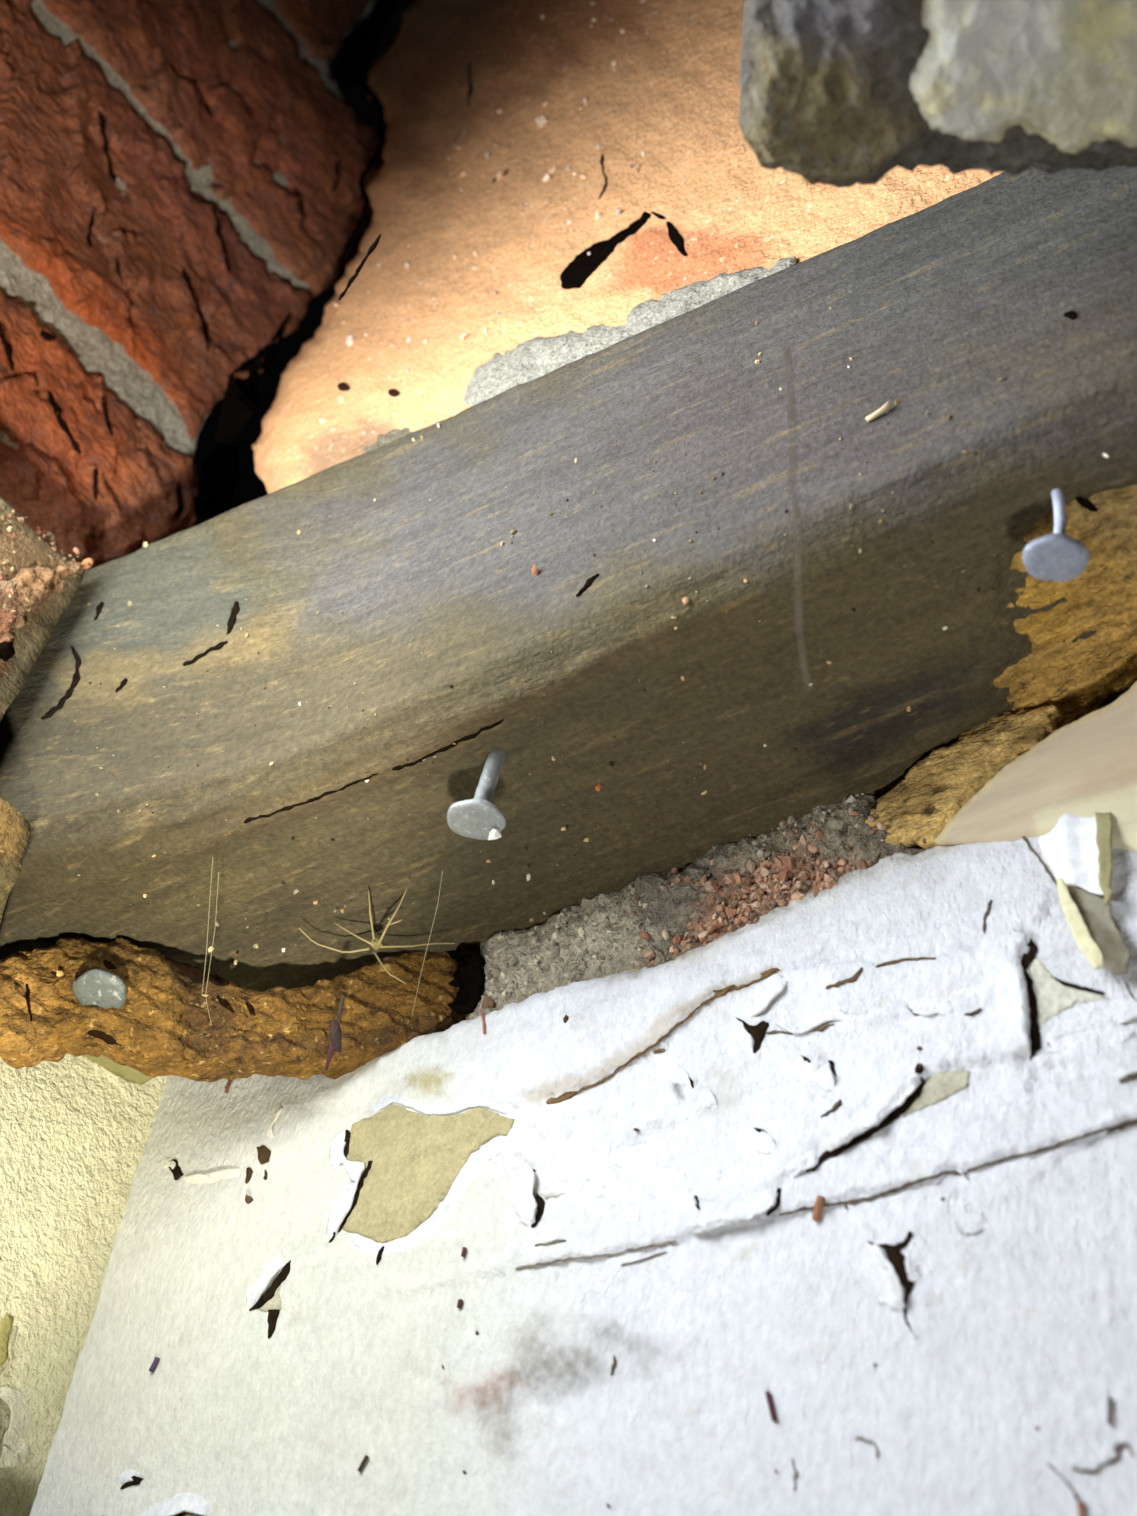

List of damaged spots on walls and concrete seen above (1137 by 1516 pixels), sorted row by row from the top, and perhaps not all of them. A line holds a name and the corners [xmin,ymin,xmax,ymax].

crack [292,0,402,301]
crack [211,207,231,274]
crack [175,269,292,520]
spalling [466,794,926,1020]
peeling [729,974,848,1053]
peeling [670,1065,718,1109]
peeling [326,1093,567,1265]
peeling [678,1055,970,1235]
crack [779,1119,1137,1216]
crack [515,1239,676,1270]
peeling [859,1231,932,1337]